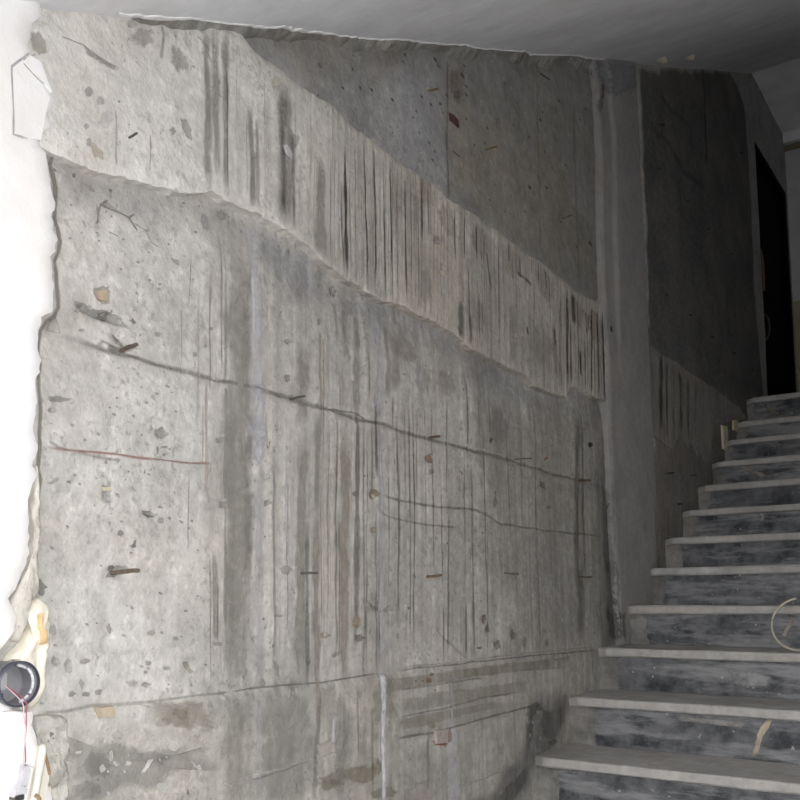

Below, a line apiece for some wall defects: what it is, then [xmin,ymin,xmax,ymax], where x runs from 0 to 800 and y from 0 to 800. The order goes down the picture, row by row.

damp [204,33,228,174]
damp [280,98,295,216]
damp [310,158,419,289]
crack [51,442,208,464]
damp [209,235,271,635]
crack [88,337,579,480]
damp [397,430,415,576]
damp [459,294,480,340]
damp [559,296,605,394]
damp [286,422,360,759]
crack [222,674,370,693]
crack [416,647,591,679]